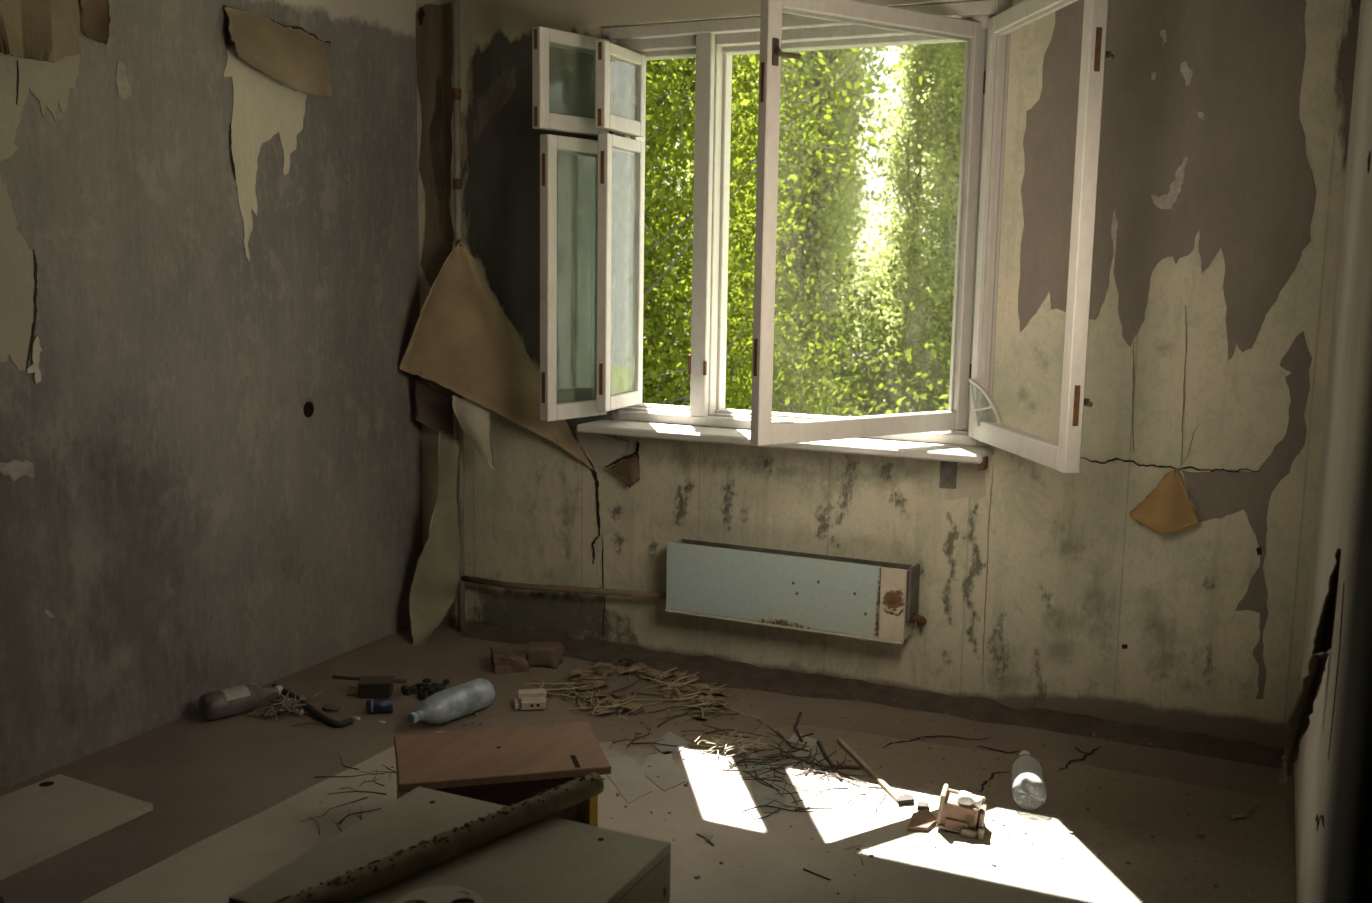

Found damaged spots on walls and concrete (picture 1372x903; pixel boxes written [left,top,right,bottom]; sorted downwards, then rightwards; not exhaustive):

peeling [0,52,80,370]
peeling [223,38,307,261]
flaking render [1018,0,1084,332]
flaking render [1089,0,1316,361]
crack [1081,305,1260,472]
damp [476,586,637,644]
crack [571,431,605,640]
damp [675,485,694,523]
damp [816,463,855,545]
damp [943,505,1009,679]
flaking render [1182,331,1312,699]